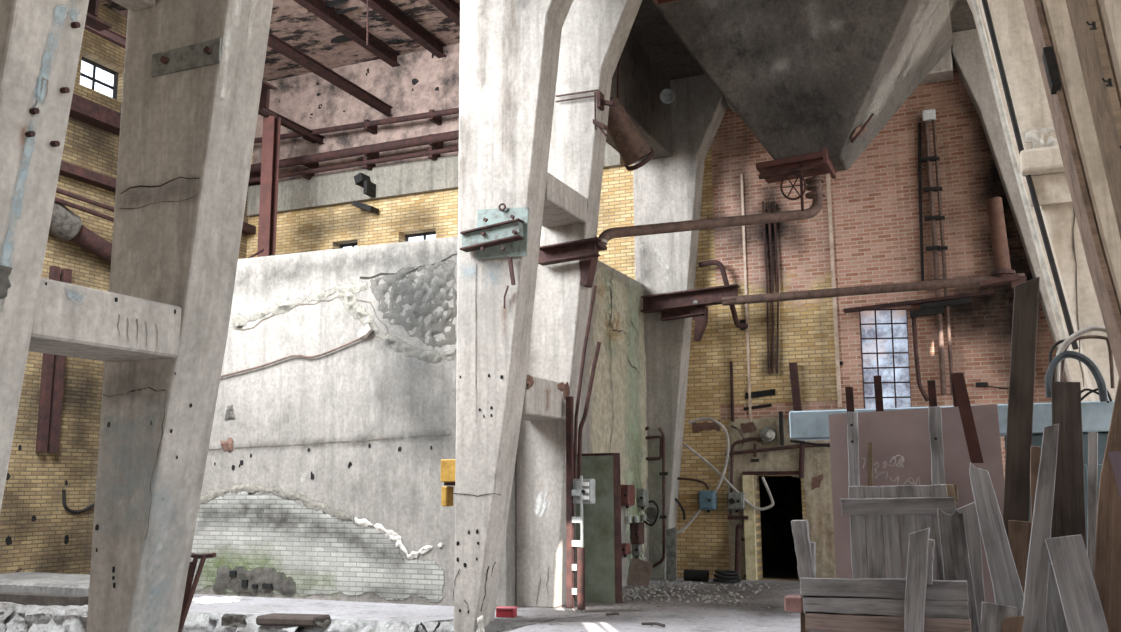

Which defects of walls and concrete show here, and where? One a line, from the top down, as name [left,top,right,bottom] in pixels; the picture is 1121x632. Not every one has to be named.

crack [119,177,199,210]
crack [234,253,477,346]
spalling [370,260,457,348]
spalling [220,437,252,470]
peeling [190,484,444,602]